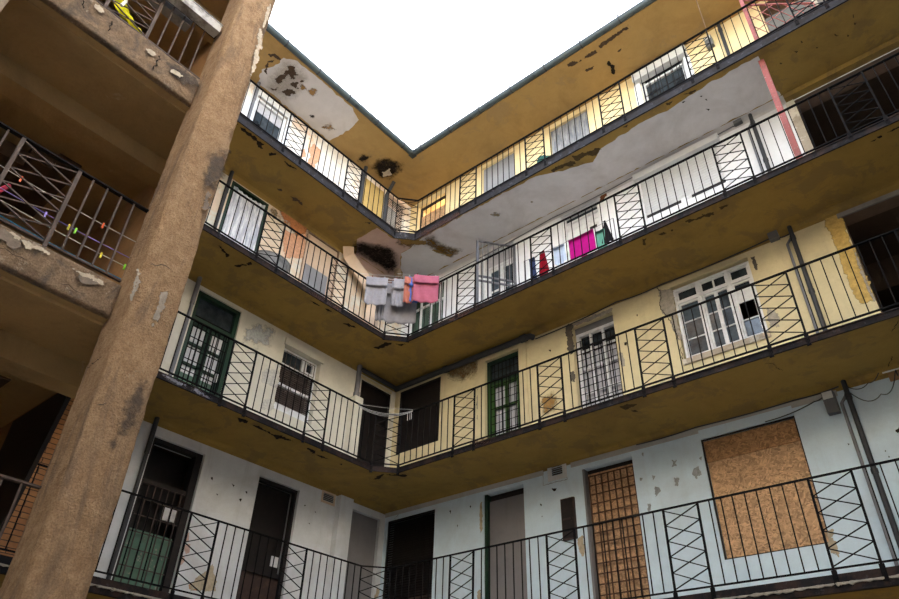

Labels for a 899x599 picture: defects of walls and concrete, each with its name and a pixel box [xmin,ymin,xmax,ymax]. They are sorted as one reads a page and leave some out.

spalling [250,4,303,96]
peeling [567,27,629,72]
peeling [551,148,602,172]
spalling [0,228,50,255]
leakage [353,242,397,273]
spalling [398,239,452,257]
peeling [825,215,876,304]
spalling [72,268,104,285]
spalling [130,268,141,301]
spalling [151,291,168,327]
spalling [659,289,682,340]